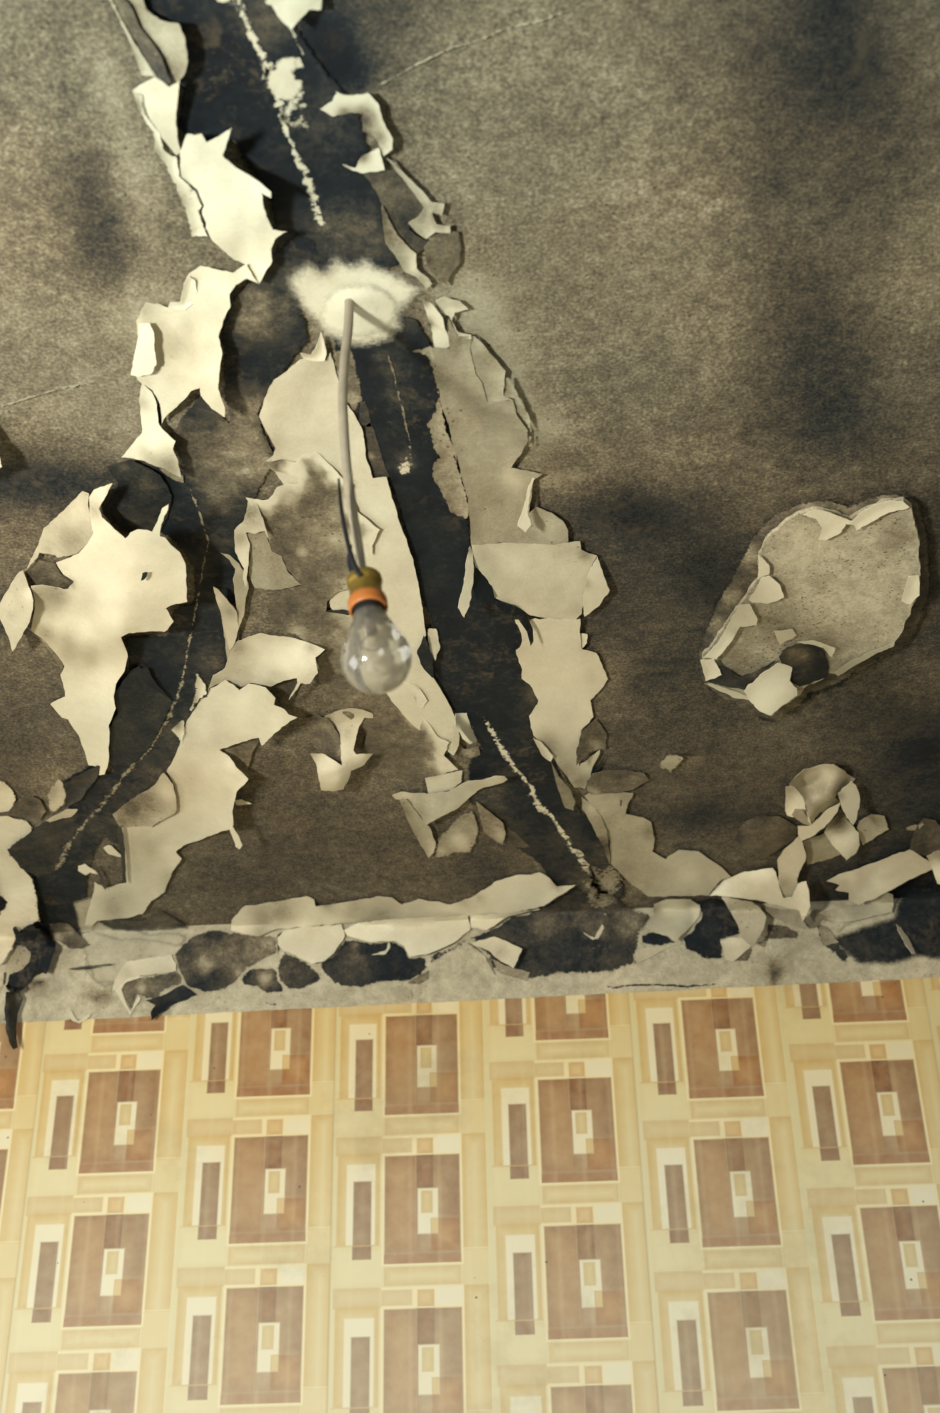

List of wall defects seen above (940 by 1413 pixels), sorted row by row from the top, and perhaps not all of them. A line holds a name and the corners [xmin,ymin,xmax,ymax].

crack [217,0,325,231]
crack [380,0,600,85]
peeling [0,0,940,1050]
crack [54,489,209,873]
crack [485,721,623,915]
leakage [836,886,940,963]